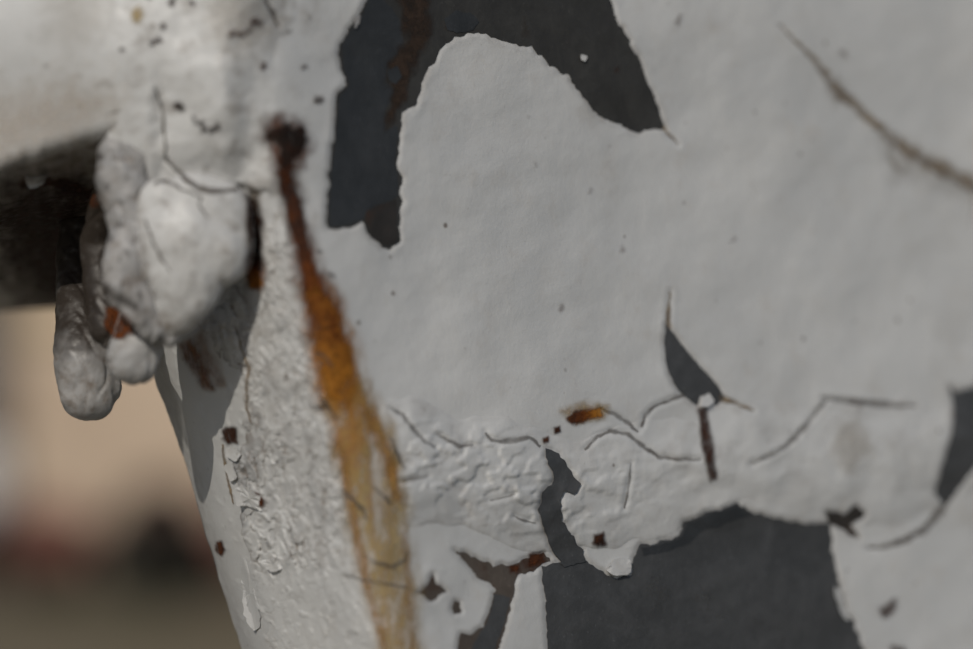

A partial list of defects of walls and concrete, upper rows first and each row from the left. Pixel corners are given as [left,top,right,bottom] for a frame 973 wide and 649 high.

crack [154,89,254,216]
peeling [326,0,678,250]
crack [794,41,973,189]
rust [278,164,414,649]
crack [395,411,541,448]
rust [543,406,604,443]
crack [586,408,701,461]
peeling [641,291,754,427]
crack [756,398,917,462]
peeling [867,386,973,549]
peeling [418,574,447,601]
peeling [454,448,865,649]